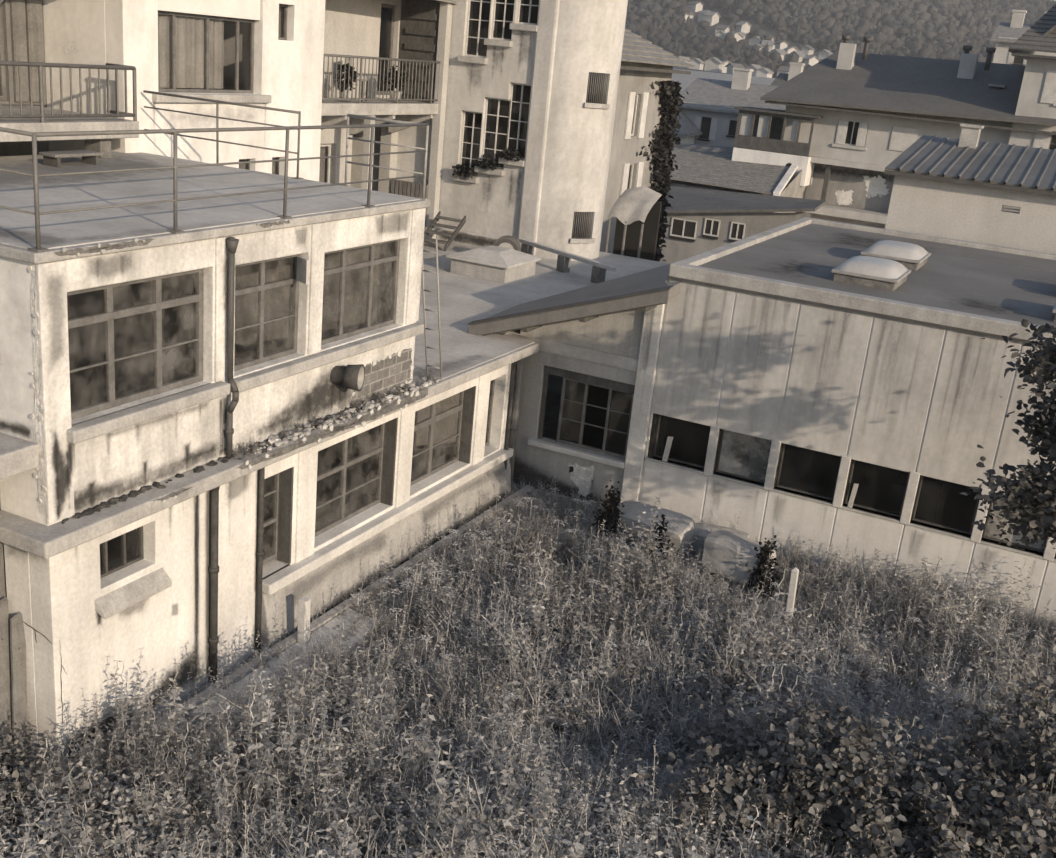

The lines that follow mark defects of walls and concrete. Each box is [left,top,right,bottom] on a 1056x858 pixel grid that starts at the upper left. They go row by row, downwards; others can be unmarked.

peeling [835,175,890,205]
leakage [54,398,227,515]